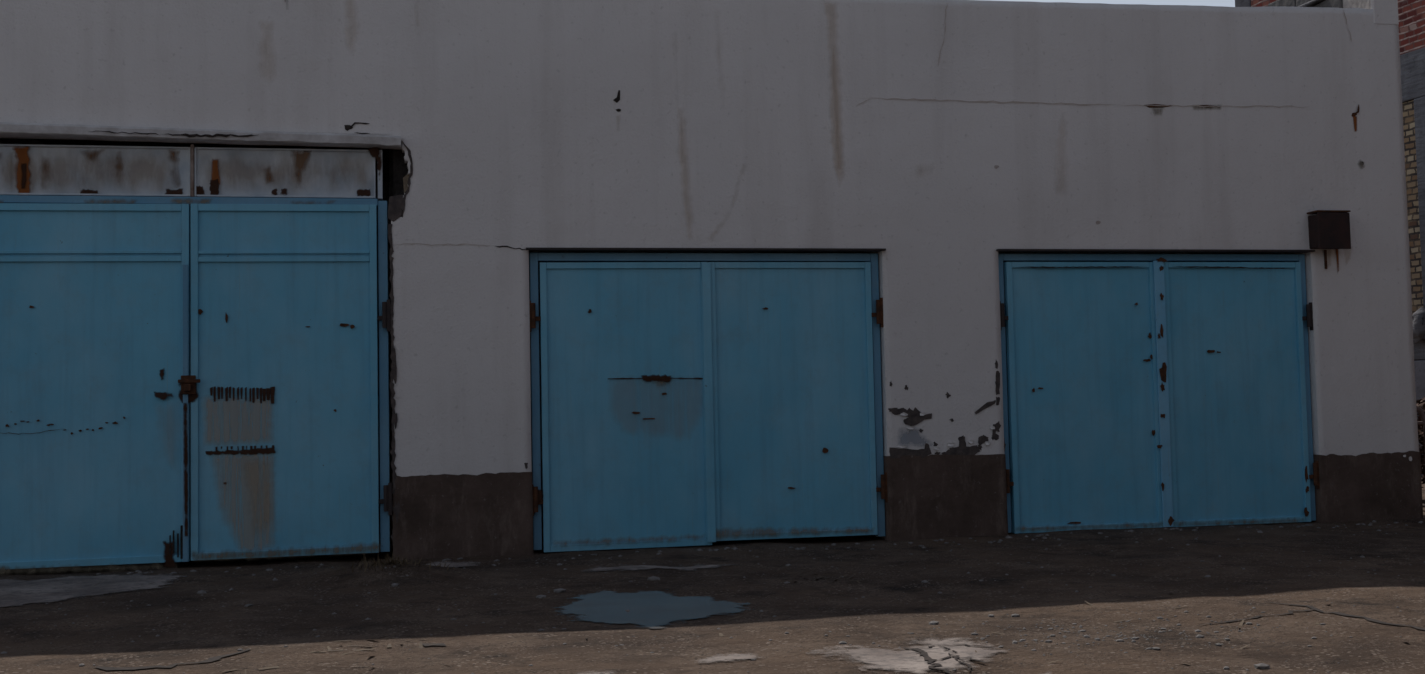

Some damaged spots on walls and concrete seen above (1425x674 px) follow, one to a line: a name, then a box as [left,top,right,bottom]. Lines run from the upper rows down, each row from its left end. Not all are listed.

corrosion [14,146,47,193]
corrosion [80,189,134,203]
corrosion [166,160,220,204]
corrosion [266,151,310,195]
corrosion [368,147,382,175]
corrosion [608,375,703,384]
flaking render [975,360,1000,414]
flaking render [888,408,1001,458]
corrosion [0,369,379,574]